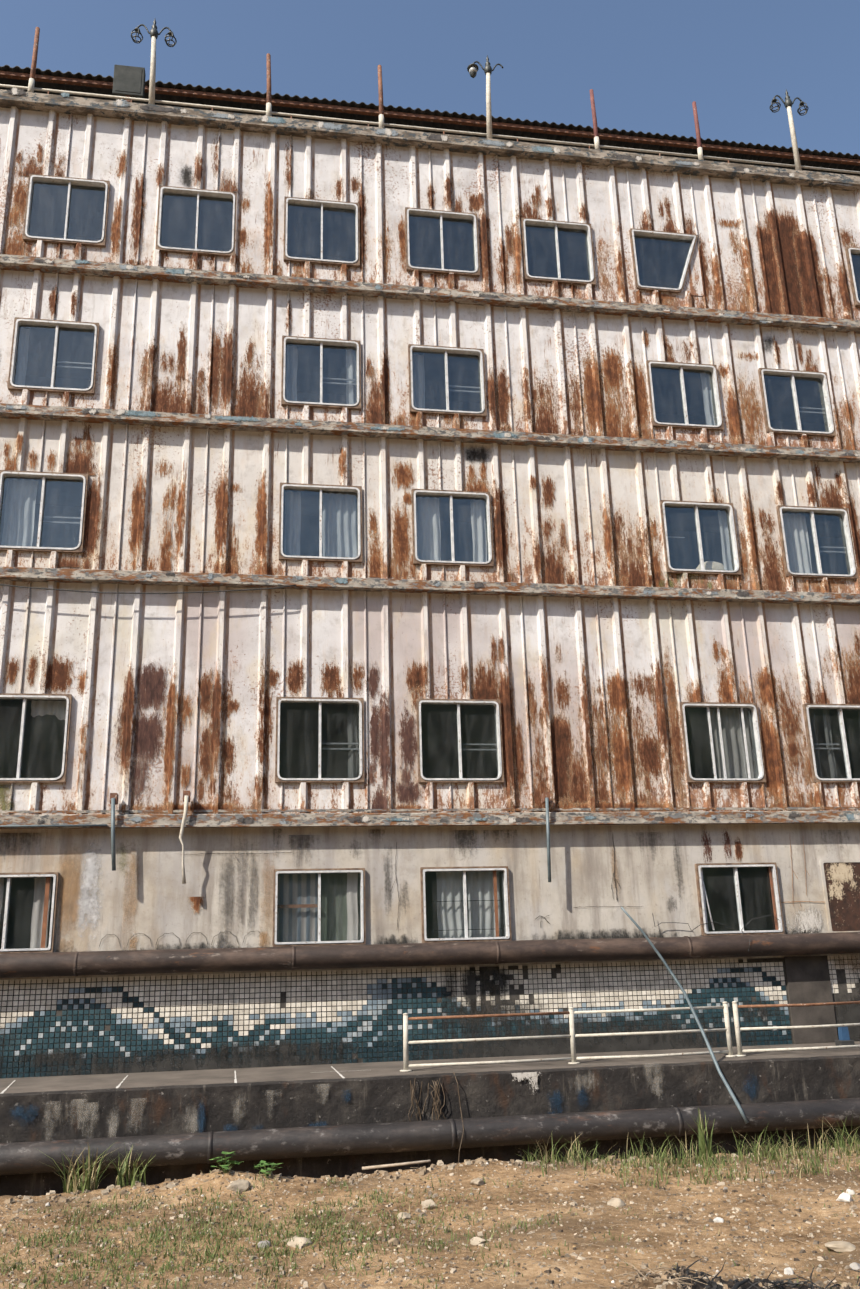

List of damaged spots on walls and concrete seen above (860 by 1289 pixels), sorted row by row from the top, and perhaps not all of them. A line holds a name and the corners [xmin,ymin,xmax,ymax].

corrosion [593,198,852,372]
corrosion [132,321,272,418]
corrosion [486,350,653,439]
corrosion [833,397,856,450]
corrosion [3,654,87,694]
corrosion [114,659,304,814]
corrosion [320,660,428,813]
corrosion [460,632,860,812]
corrosion [735,837,743,860]
damp [141,853,267,950]
peeling [782,862,860,933]
spalling [511,1072,540,1095]